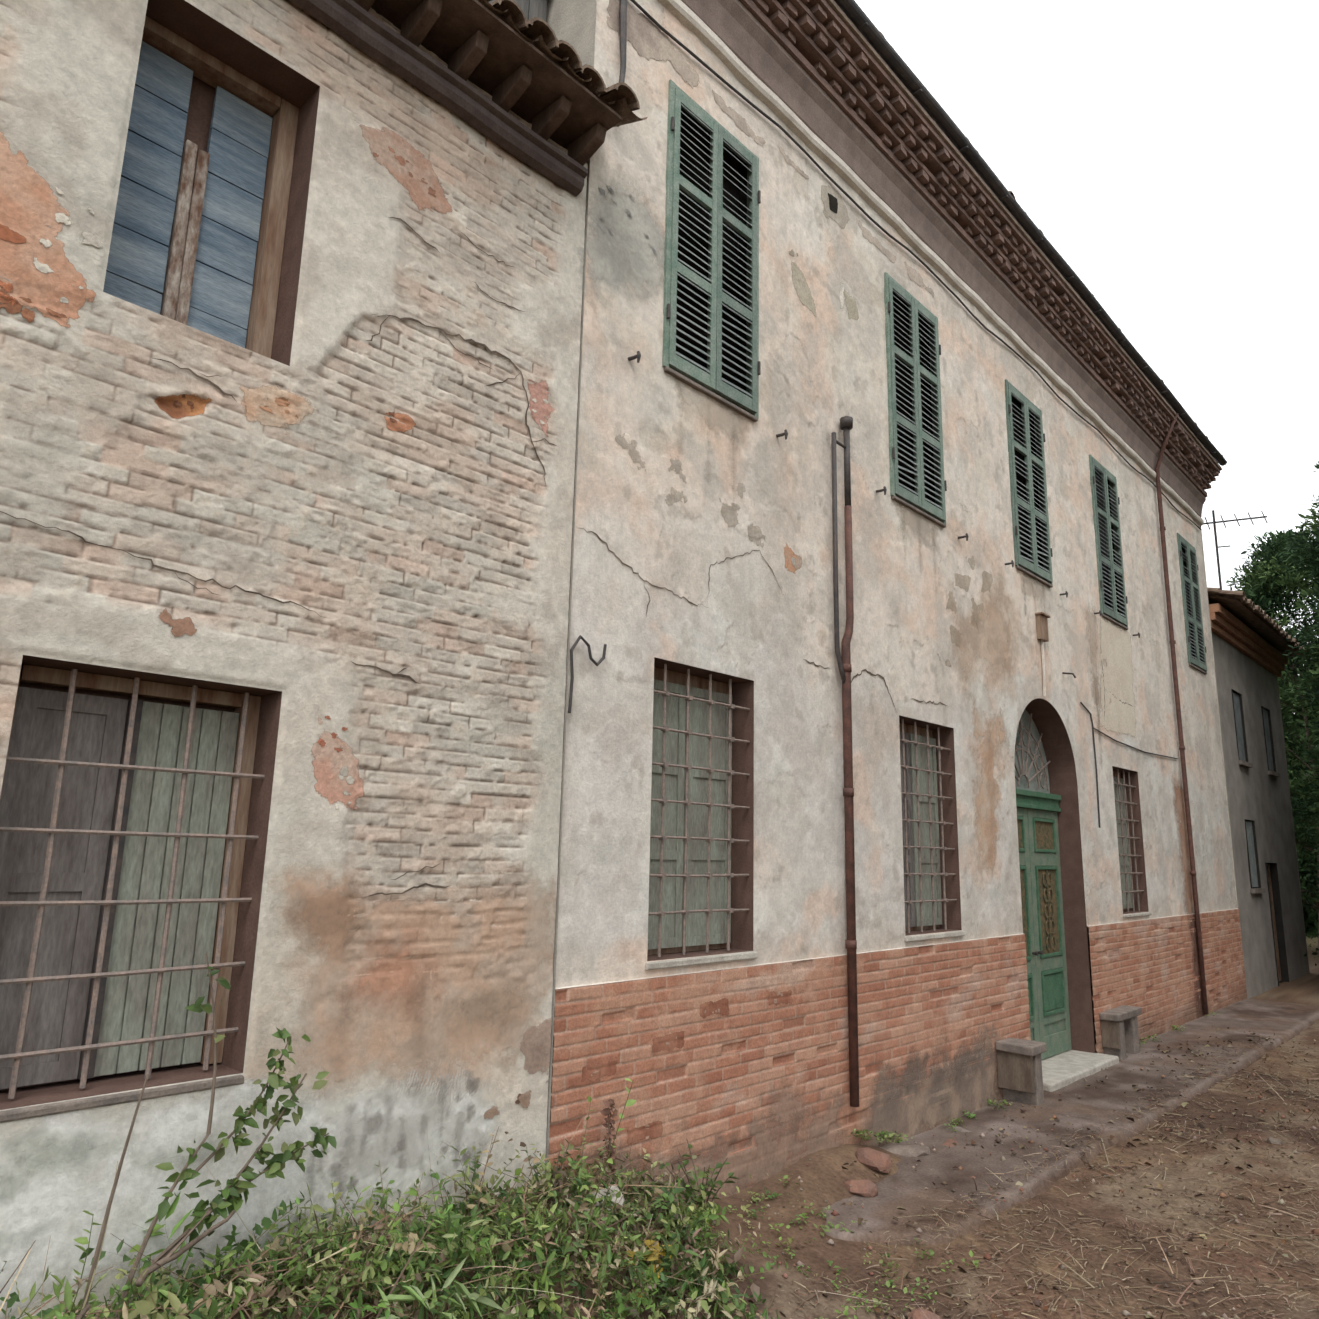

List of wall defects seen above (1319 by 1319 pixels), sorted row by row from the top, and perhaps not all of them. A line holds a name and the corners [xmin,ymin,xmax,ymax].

spalling [360,125,452,214]
flaking render [0,132,103,328]
spalling [155,394,211,418]
flaking render [240,385,318,428]
spalling [385,412,416,433]
crack [366,314,556,484]
spalling [528,379,555,436]
crack [0,511,334,619]
crack [585,530,782,615]
peeling [159,609,197,637]
flaking render [312,716,364,810]
leakage [0,878,552,1319]